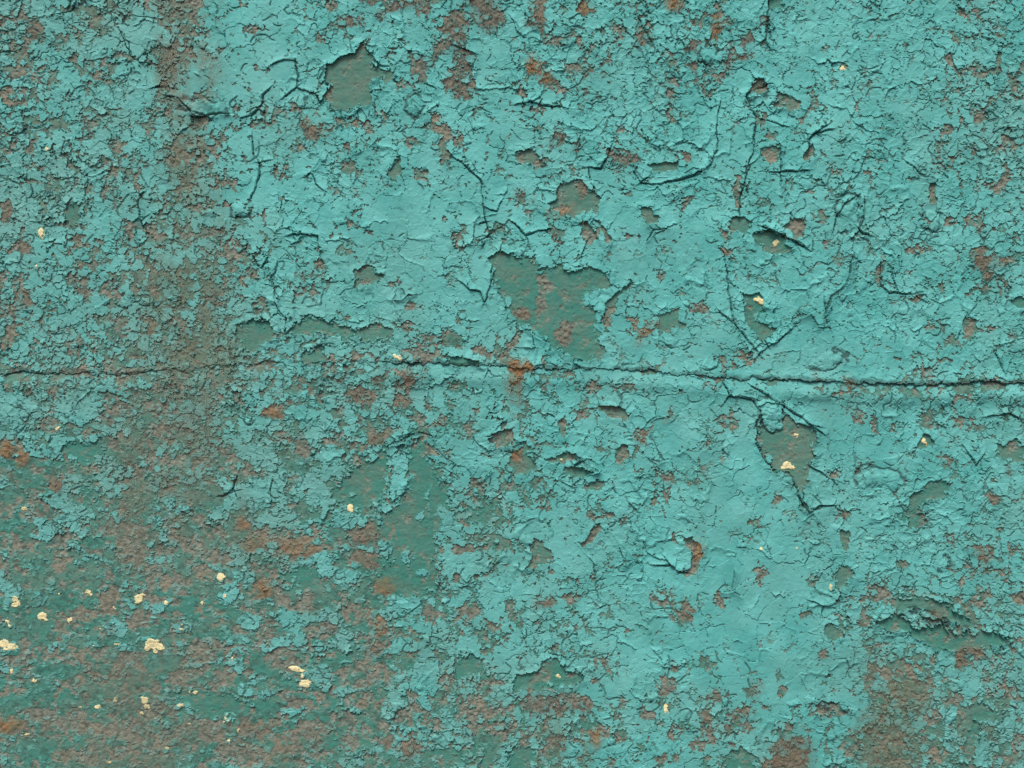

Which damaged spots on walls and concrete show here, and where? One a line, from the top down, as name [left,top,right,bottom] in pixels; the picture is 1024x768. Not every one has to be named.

crack [119,28,327,201]
peeling [316,38,396,120]
crack [451,43,475,54]
crack [450,153,551,245]
crack [516,96,564,109]
peeling [487,141,642,367]
crack [588,82,833,249]
crack [0,191,1024,514]
peeling [749,398,823,517]
peeling [326,438,457,611]
peeling [144,639,165,653]
peeling [870,591,1014,662]